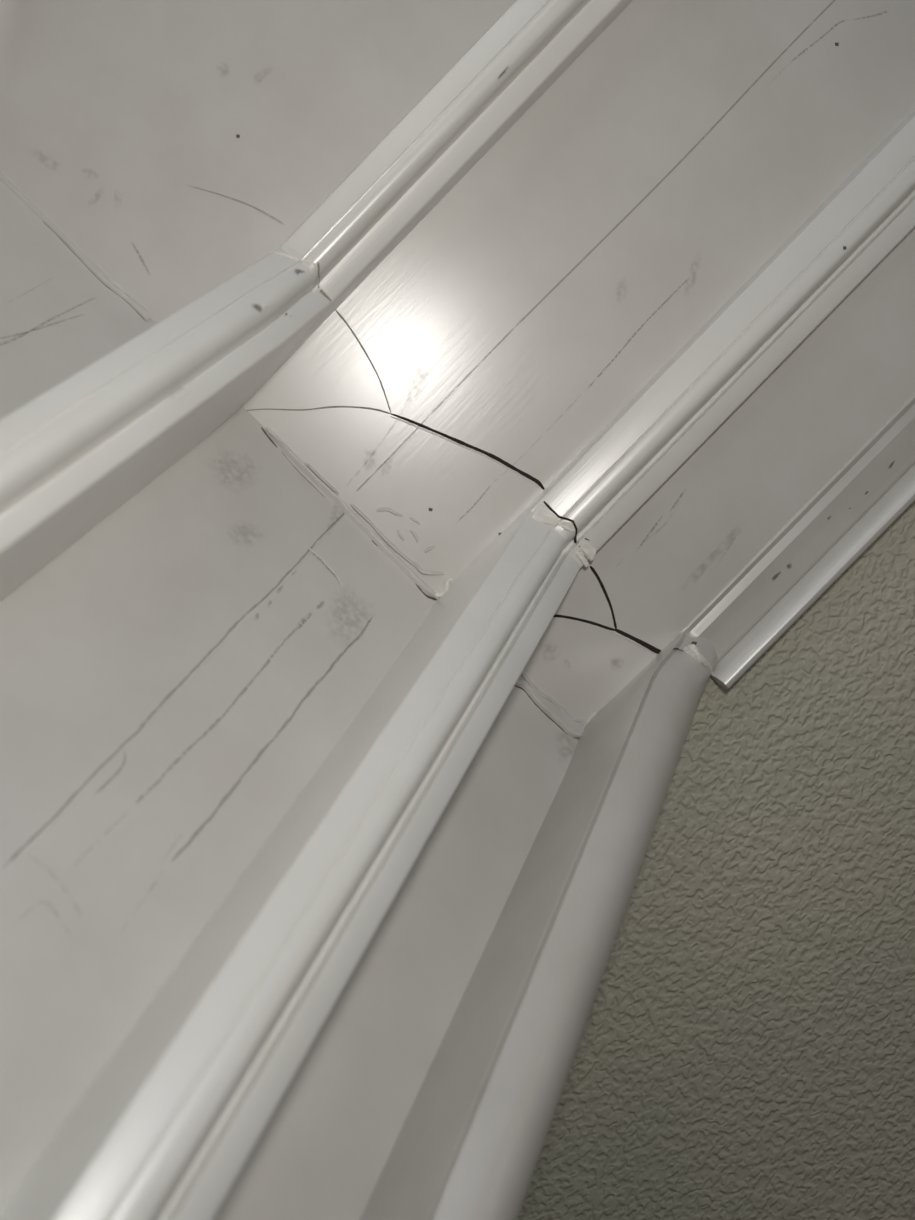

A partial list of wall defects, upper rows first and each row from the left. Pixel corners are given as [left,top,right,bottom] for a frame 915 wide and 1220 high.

crack [247,251,682,655]